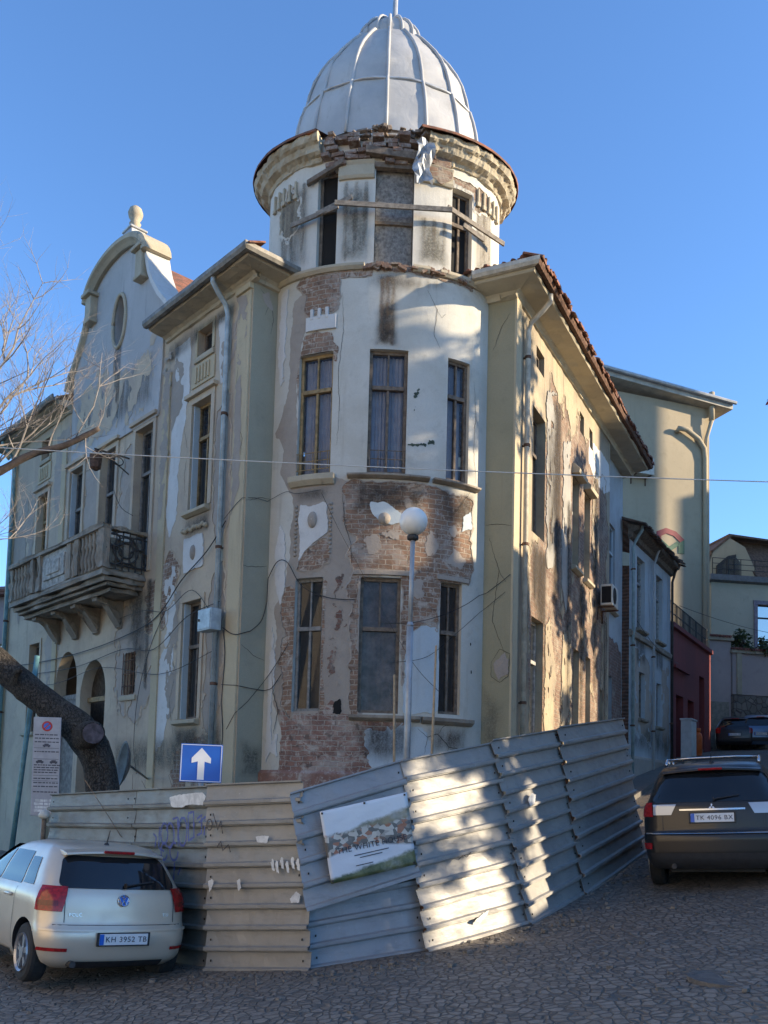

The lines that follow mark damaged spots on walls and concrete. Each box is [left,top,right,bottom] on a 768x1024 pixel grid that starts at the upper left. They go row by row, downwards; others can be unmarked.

flaking render [278,261,474,397]
flaking render [264,478,474,772]
flaking render [526,371,622,733]